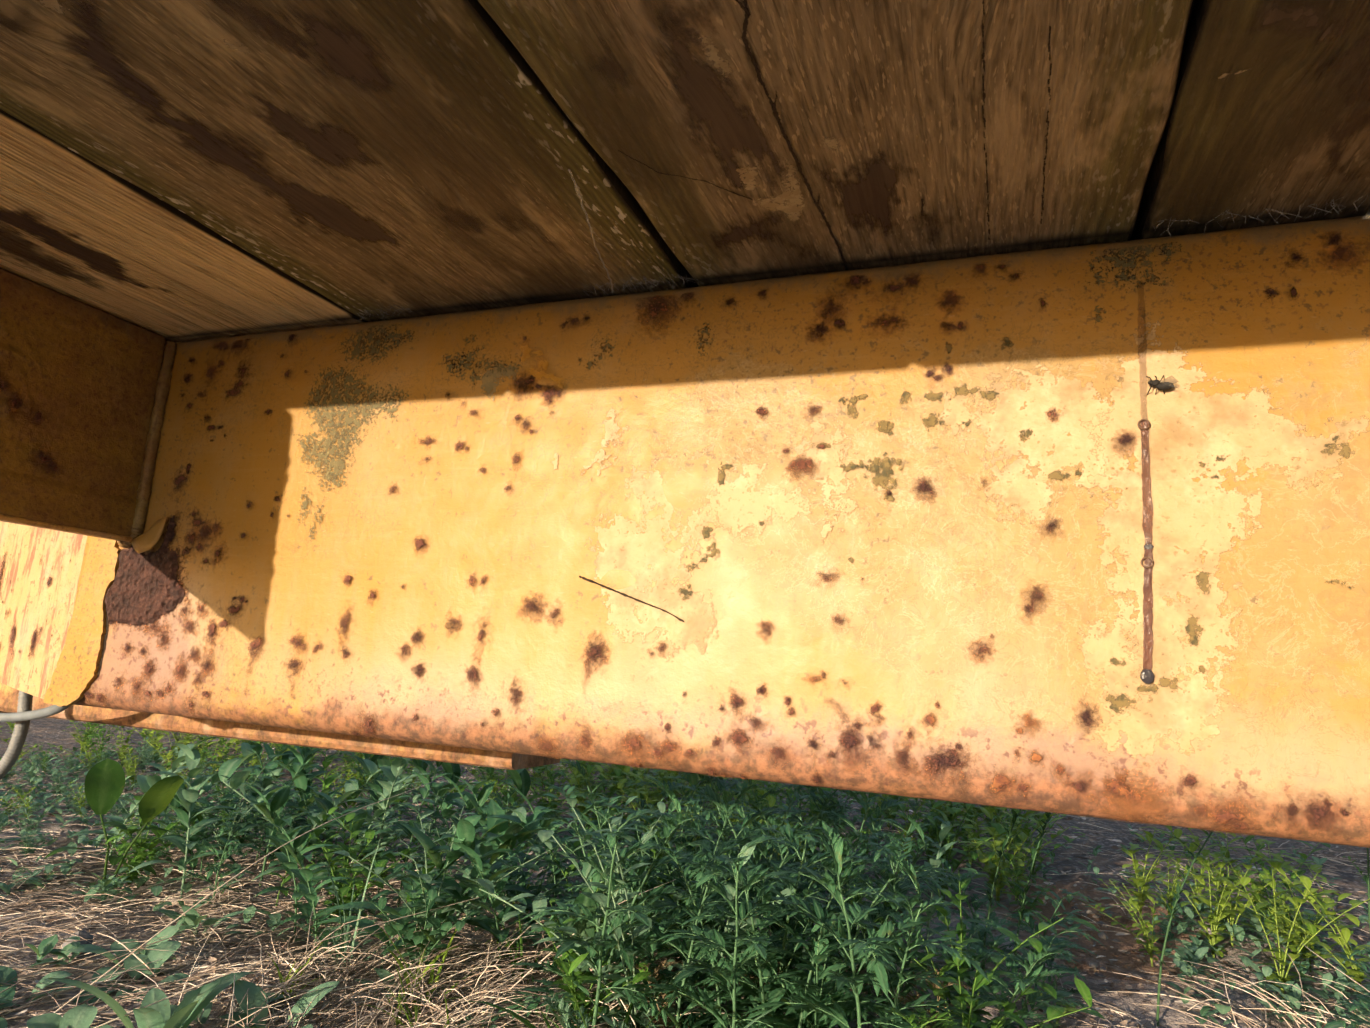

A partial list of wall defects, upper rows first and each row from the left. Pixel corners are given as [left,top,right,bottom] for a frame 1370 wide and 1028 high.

damp [66,0,399,246]
damp [658,9,785,189]
crack [735,0,848,270]
crack [981,0,990,240]
crack [1040,26,1052,224]
damp [0,208,166,292]
peeling [579,408,858,662]
peeling [933,312,1370,764]
rust [401,632,423,677]
rust [712,719,760,746]
rust [719,685,765,711]
rust [809,704,881,758]